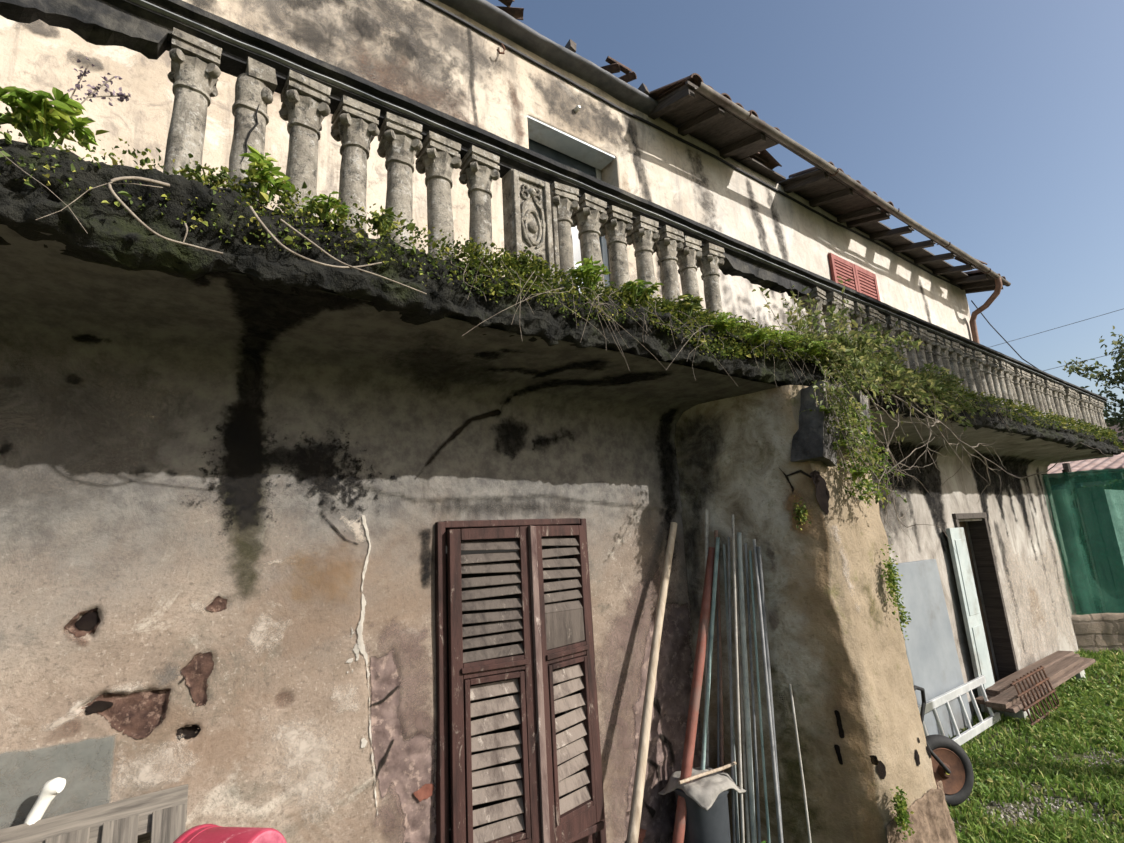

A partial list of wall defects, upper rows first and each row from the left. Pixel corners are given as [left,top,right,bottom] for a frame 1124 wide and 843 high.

damp [255,0,502,122]
damp [688,150,714,229]
damp [747,180,788,261]
damp [182,270,381,594]
damp [869,441,948,551]
damp [971,451,1071,629]
spalling [64,608,101,643]
spalling [50,652,214,739]
peeling [273,722,337,817]
crack [322,514,378,815]
flaking render [370,621,436,843]
flaking render [597,562,702,843]